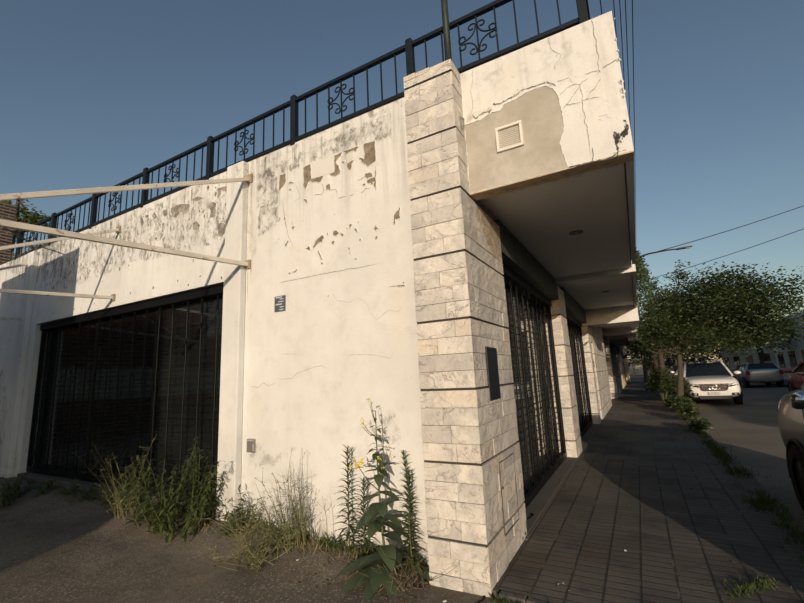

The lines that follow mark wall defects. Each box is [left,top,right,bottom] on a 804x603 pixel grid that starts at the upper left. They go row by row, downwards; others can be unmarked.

peeling [279,140,377,204]
spalling [465,82,570,193]
crack [548,16,620,168]
peeling [47,185,227,283]
peeling [306,222,362,265]